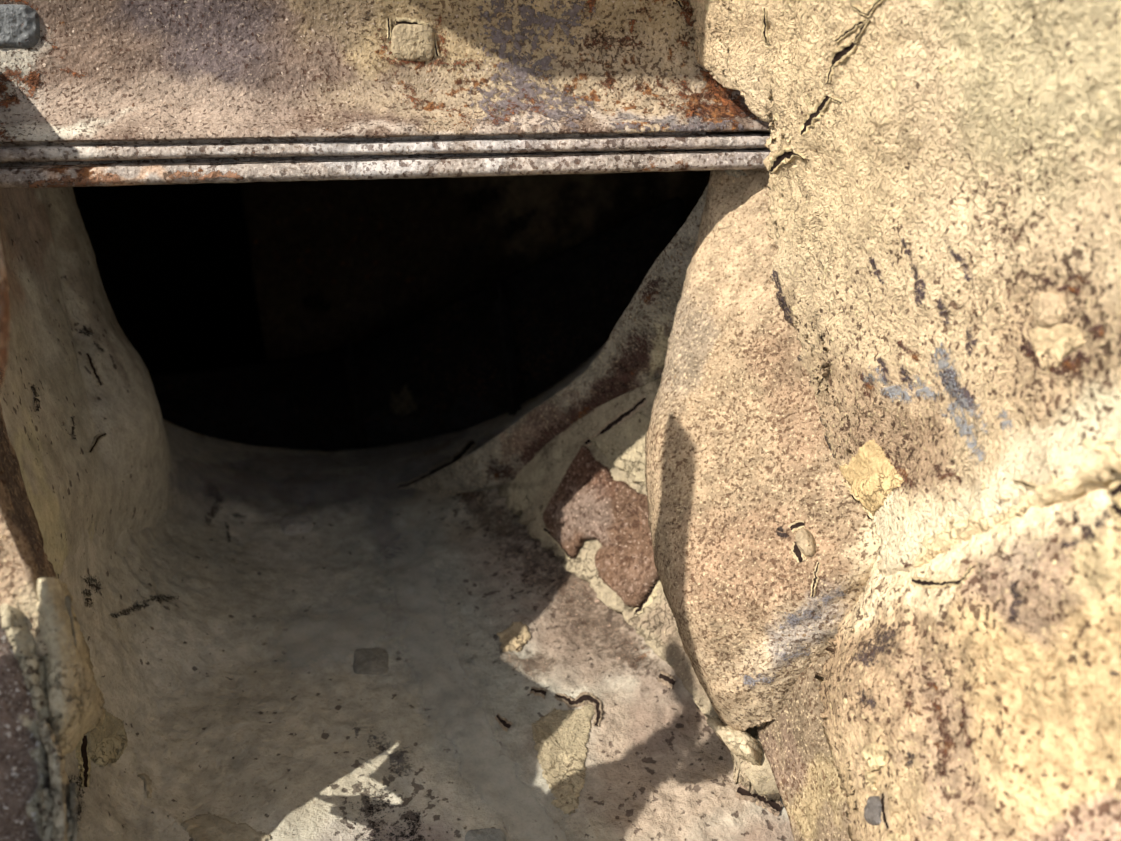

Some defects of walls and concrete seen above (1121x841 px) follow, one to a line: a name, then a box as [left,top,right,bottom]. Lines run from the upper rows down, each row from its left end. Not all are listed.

corrosion [0,63,45,143]
corrosion [375,17,483,75]
corrosion [397,84,547,125]
corrosion [579,9,652,103]
corrosion [655,64,754,123]
crack [768,0,884,173]
peeling [590,411,651,485]
peeling [839,440,904,516]
damp [350,727,426,841]
crack [495,713,512,732]
peeling [531,704,595,815]
crack [530,687,603,727]